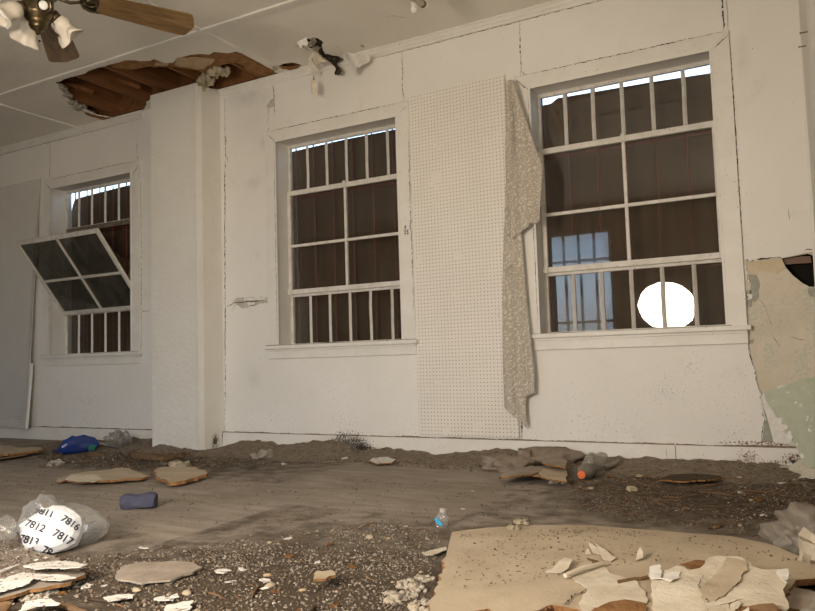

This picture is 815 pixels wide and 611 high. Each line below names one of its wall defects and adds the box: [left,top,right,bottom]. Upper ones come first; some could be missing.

flaking render [744,252,815,394]